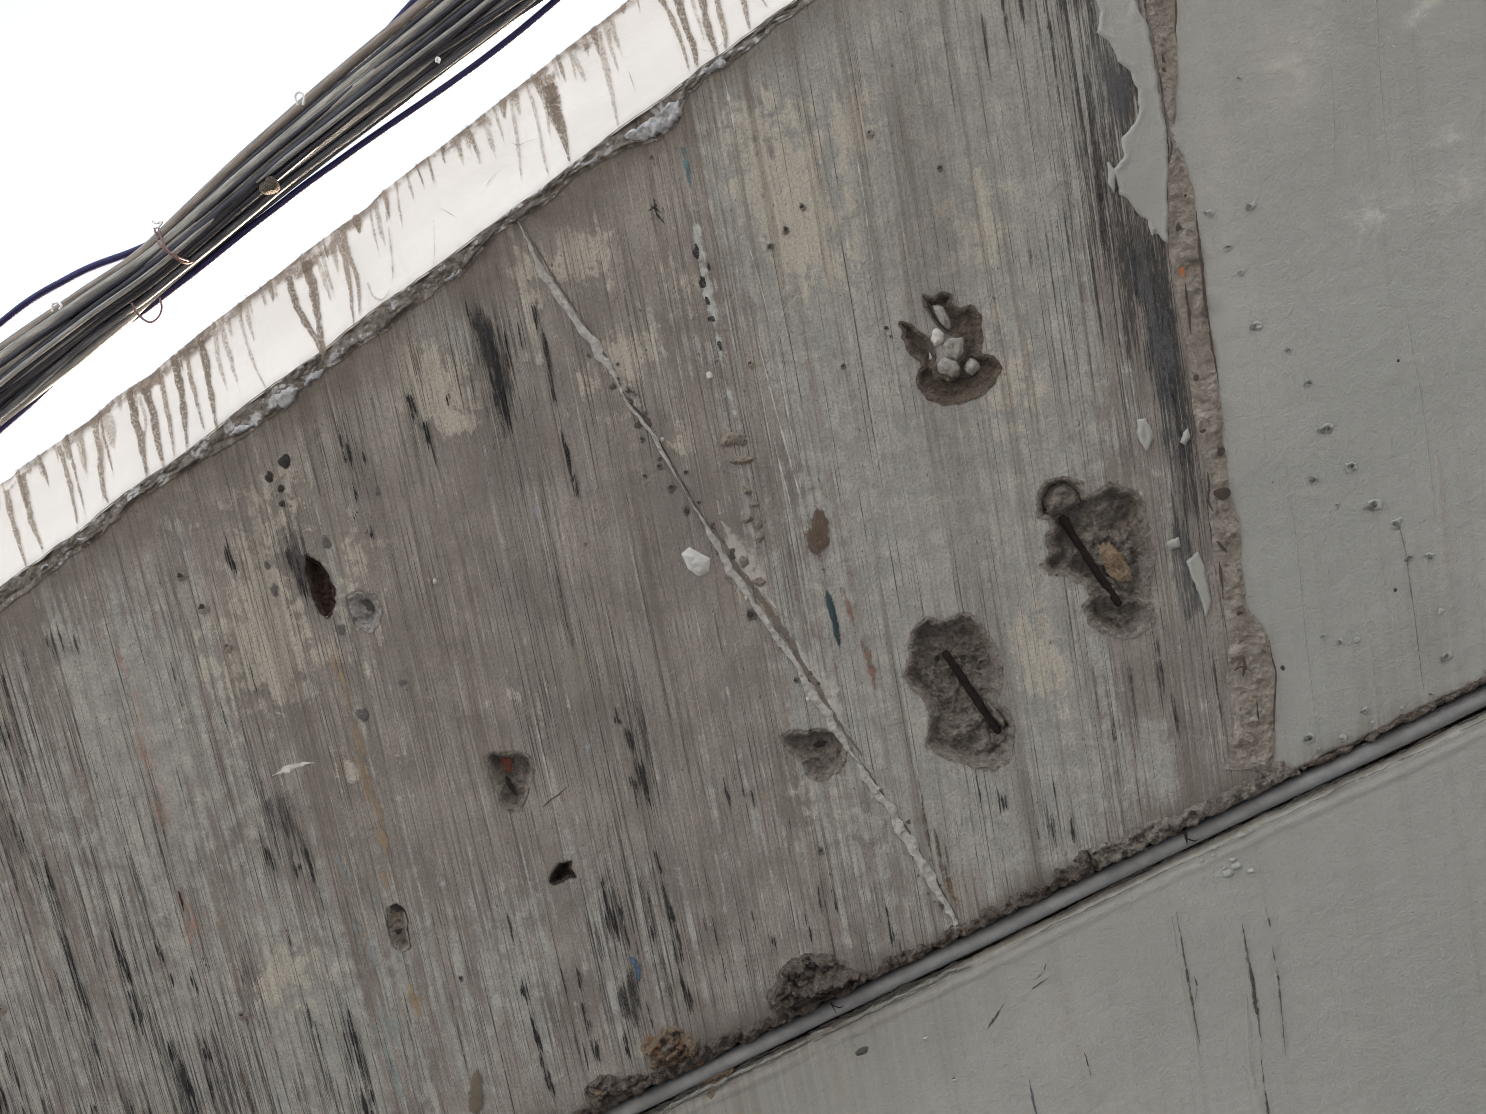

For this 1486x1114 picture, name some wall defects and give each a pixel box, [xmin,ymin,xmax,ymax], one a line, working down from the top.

spalling [0,0,812,612]
spalling [898,292,1003,406]
crack [1185,212,1219,384]
water stain [45,627,79,661]
water stain [224,536,237,577]
water stain [264,561,278,597]
water stain [285,536,308,604]
crack [517,221,971,1114]
spalling [902,612,1016,772]
spalling [1035,475,1212,640]
crack [1234,458,1319,732]
crack [1002,711,1486,947]